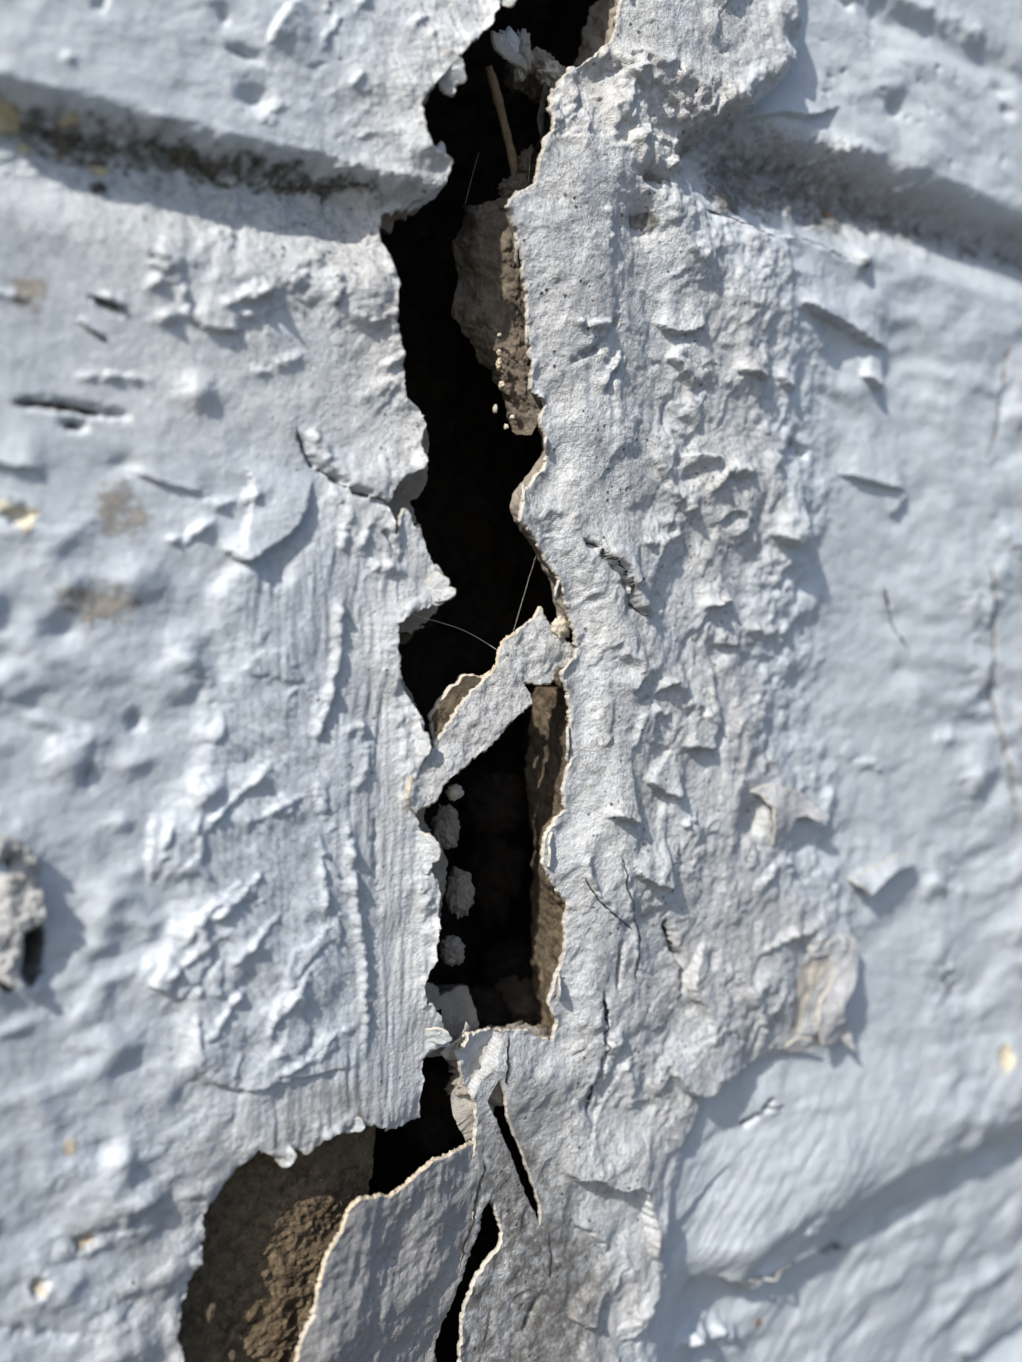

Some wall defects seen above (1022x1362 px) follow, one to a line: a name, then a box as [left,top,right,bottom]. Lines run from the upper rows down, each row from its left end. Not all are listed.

crack [243,0,682,1362]
crack [987,553,1017,841]
spalling [177,1125,482,1362]